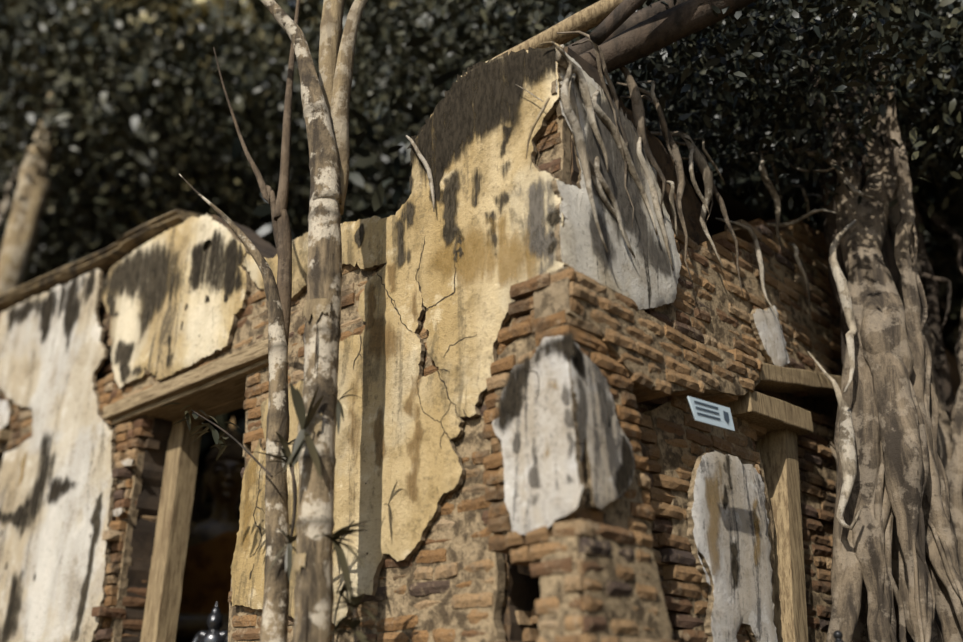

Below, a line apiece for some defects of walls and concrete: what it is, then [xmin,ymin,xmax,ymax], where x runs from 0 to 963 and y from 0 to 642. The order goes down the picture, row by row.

leakage [407,45,555,262]
leakage [7,230,243,382]
crack [377,262,456,336]
spalling [644,218,842,375]
leakage [0,571,22,642]
spalling [0,388,33,453]
leakage [0,435,74,538]
leakage [70,493,102,642]
spalling [95,268,269,642]
crack [417,334,477,449]
spalling [332,335,775,642]
spalling [792,391,837,642]